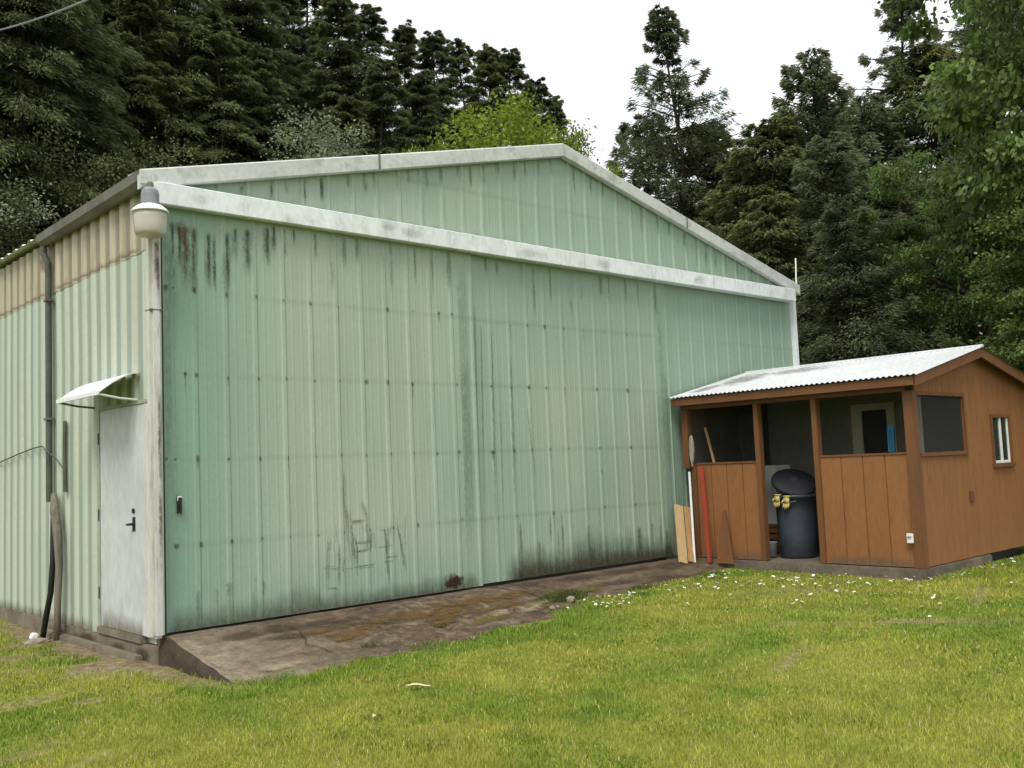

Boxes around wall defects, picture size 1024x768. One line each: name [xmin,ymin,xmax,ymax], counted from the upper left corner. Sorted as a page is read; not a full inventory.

water stain [172,224,229,279]
rust [445,575,461,588]
water stain [512,547,687,586]